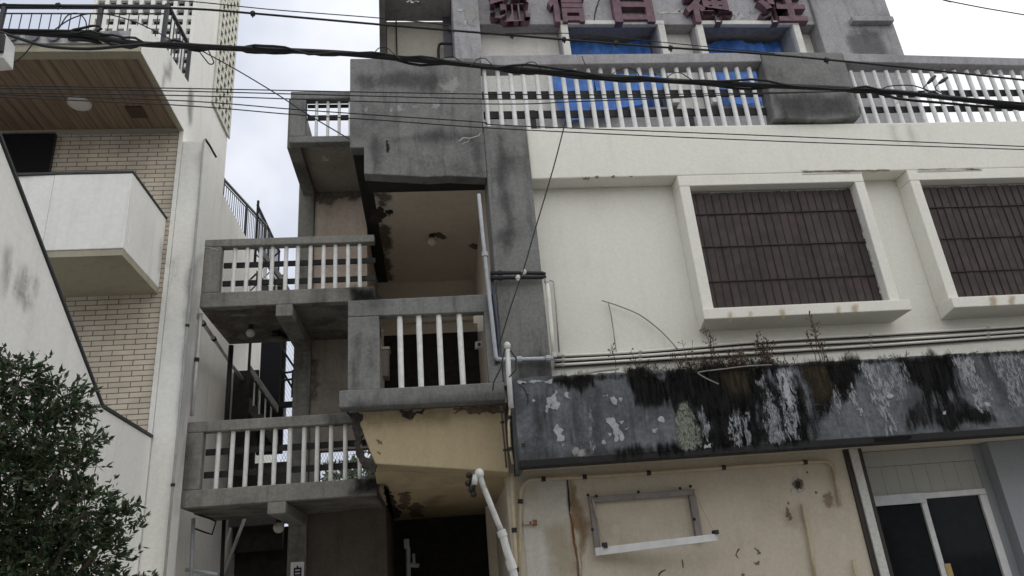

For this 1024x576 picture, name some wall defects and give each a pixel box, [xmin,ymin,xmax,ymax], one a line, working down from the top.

spalling [369,206,393,224]
spalling [400,409,424,420]
spalling [453,404,506,415]
peeling [517,379,571,413]
peeling [553,395,629,457]
leakage [554,349,1024,458]
spalling [346,412,382,475]
spalling [384,485,425,519]
spalling [786,471,817,521]